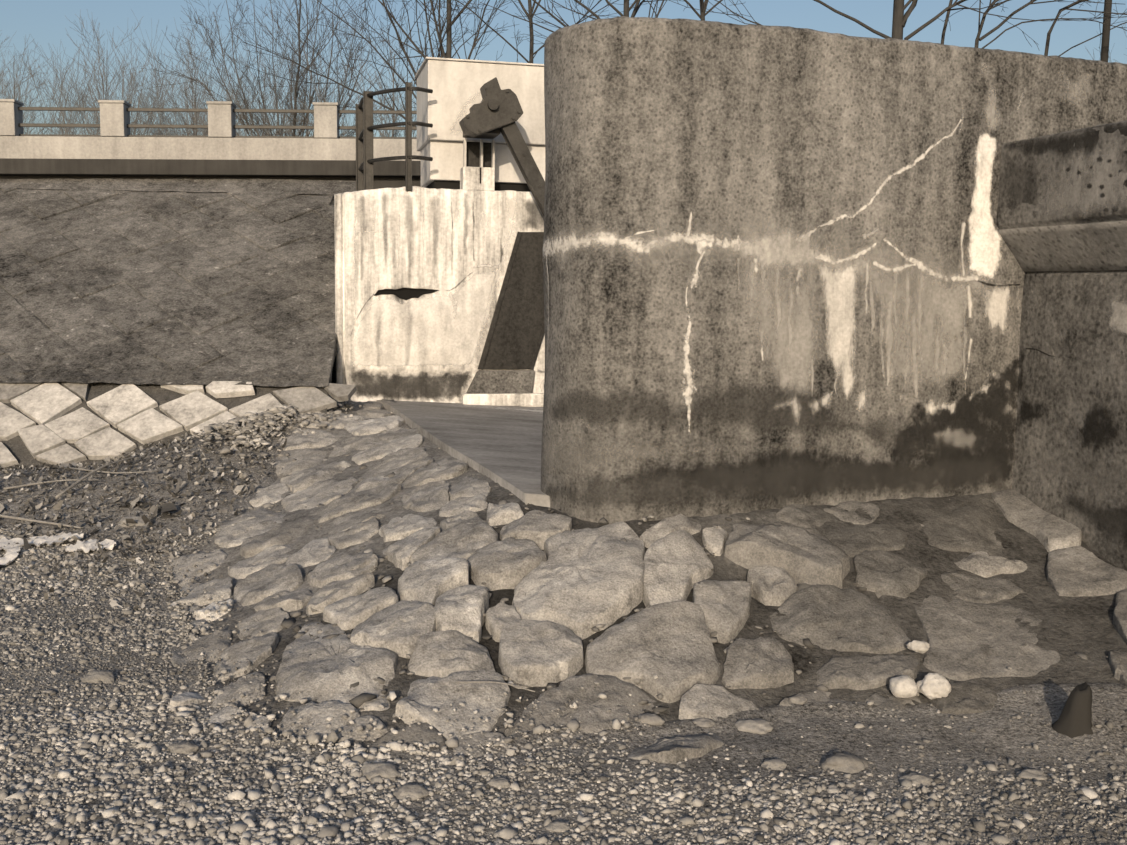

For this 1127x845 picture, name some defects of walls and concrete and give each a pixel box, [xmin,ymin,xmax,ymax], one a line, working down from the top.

crack [543,119,1020,295]
leakage [487,94,1127,432]
crack [361,283,460,311]
peeling [1109,301,1127,334]
leakage [1079,407,1117,449]
leakage [586,449,1004,506]